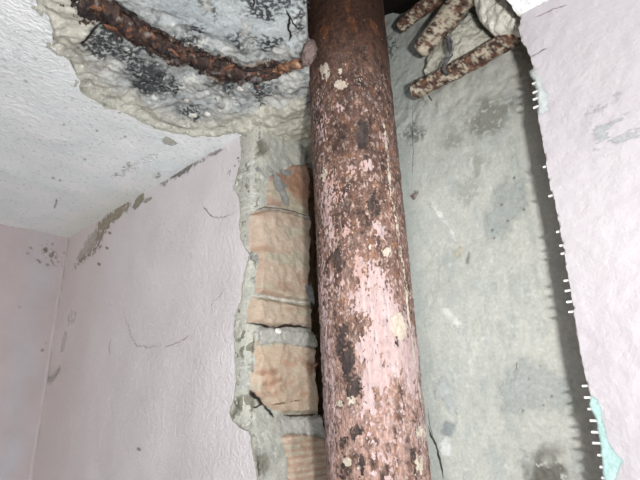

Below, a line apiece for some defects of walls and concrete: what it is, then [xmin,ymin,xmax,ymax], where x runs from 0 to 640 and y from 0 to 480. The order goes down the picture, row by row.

corrosion [60,0,317,90]
corrosion [396,0,474,57]
corrosion [410,34,522,99]
spalling [31,0,431,480]
crack [428,414,443,476]
peeling [590,397,623,480]